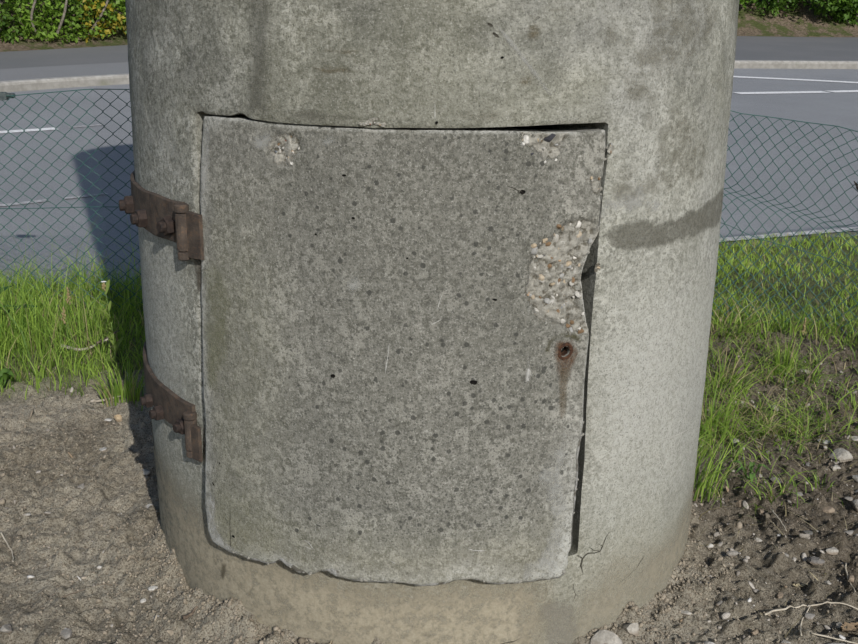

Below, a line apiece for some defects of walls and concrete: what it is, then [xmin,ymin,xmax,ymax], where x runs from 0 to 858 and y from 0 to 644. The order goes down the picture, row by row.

spalling [267,133,300,166]
water stain [613,193,723,248]
spalling [526,212,601,336]
crack [573,533,609,601]